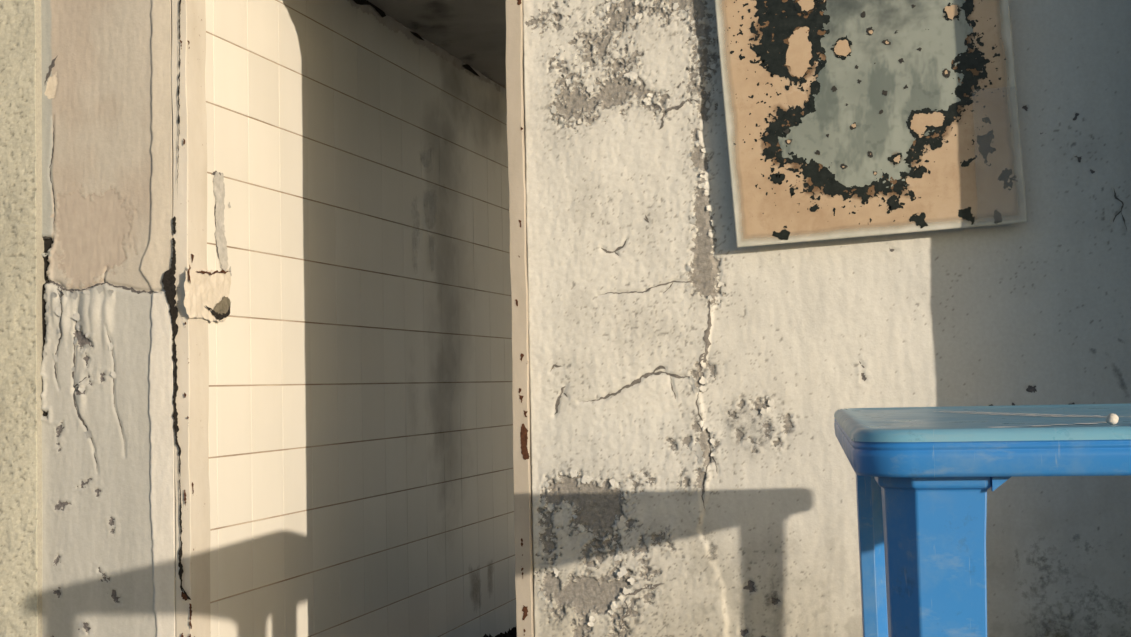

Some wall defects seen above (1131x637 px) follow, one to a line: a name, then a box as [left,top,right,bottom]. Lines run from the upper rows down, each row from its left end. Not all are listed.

spalling [162,216,176,337]
peeling [211,171,232,276]
spalling [525,0,726,394]
crack [602,281,697,295]
rust [519,388,529,460]
crack [551,364,717,509]
peeling [98,567,120,603]
spalling [534,470,675,637]